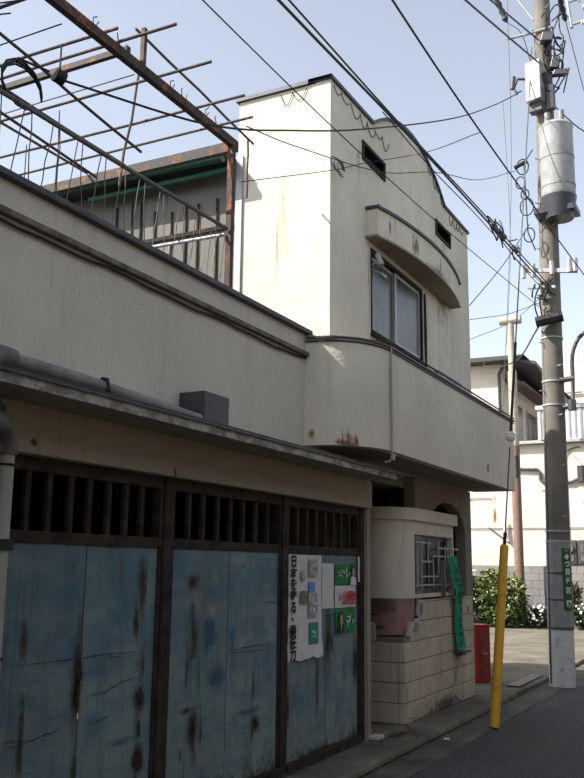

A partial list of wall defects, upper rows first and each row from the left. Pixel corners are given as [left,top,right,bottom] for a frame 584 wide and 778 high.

corrosion [134,562,147,634]
corrosion [71,615,83,718]
crack [24,652,136,666]
corrosion [132,657,144,778]
corrosion [183,707,202,763]